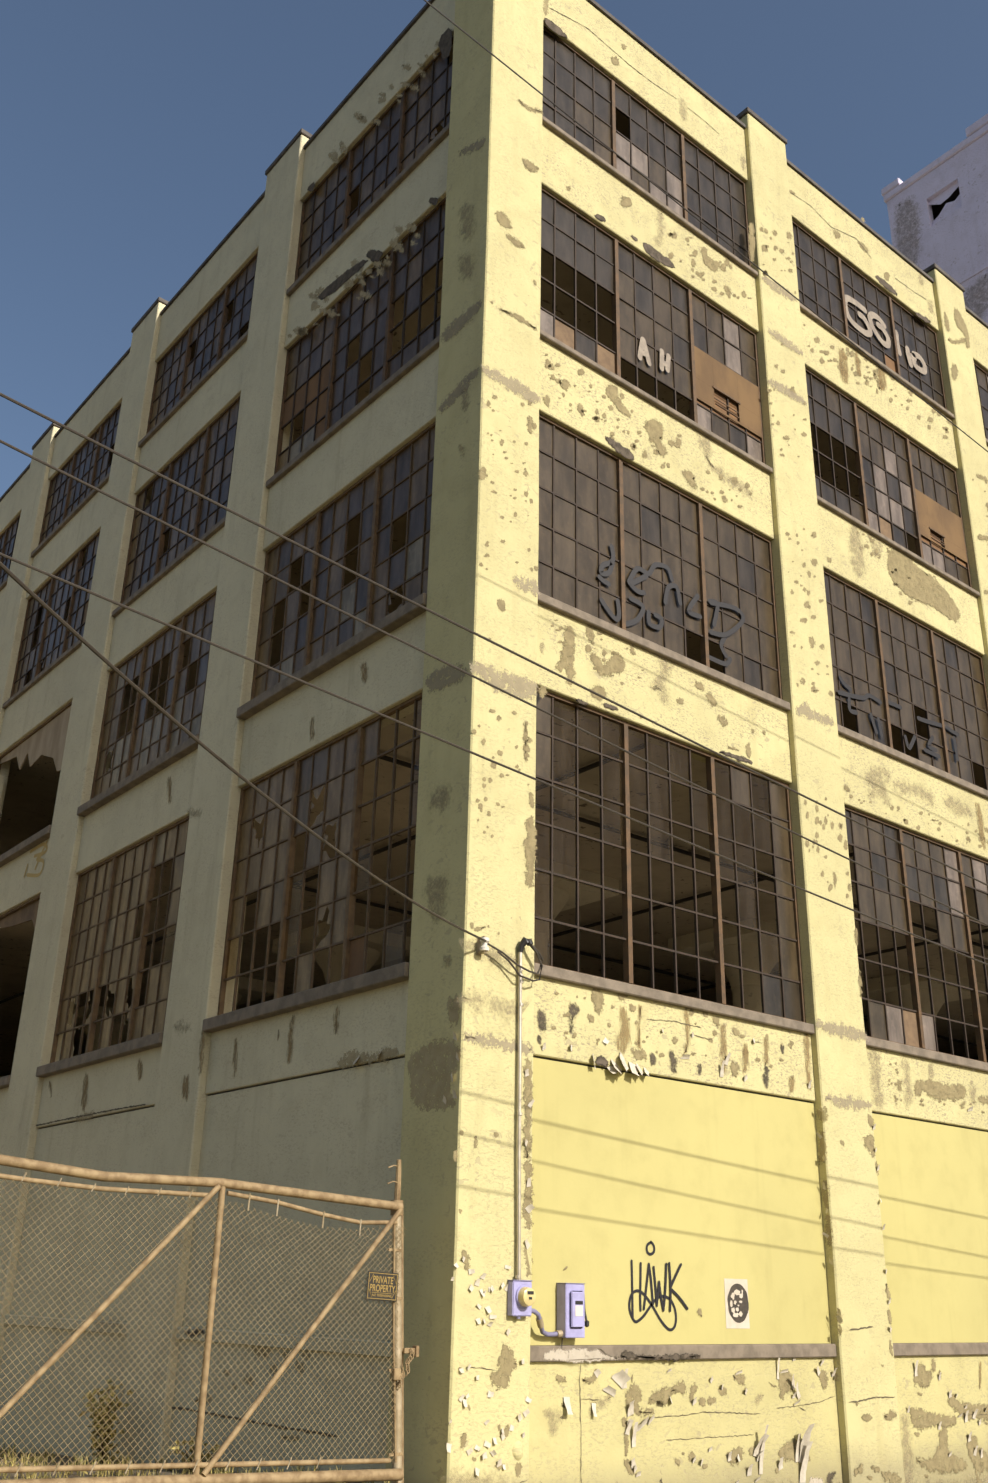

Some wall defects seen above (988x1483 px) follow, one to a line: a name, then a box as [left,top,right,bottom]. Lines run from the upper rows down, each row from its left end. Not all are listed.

spalling [288,221,421,338]
peeling [631,231,751,299]
peeling [478,353,752,523]
peeling [857,531,961,623]
peeling [551,619,644,711]
peeling [470,709,538,888]
peeling [888,1062,988,1113]
peeling [451,988,812,1411]
peeling [816,1106,845,1265]
peeling [556,1350,747,1477]
peeling [675,1423,815,1483]
peeling [854,1358,988,1483]